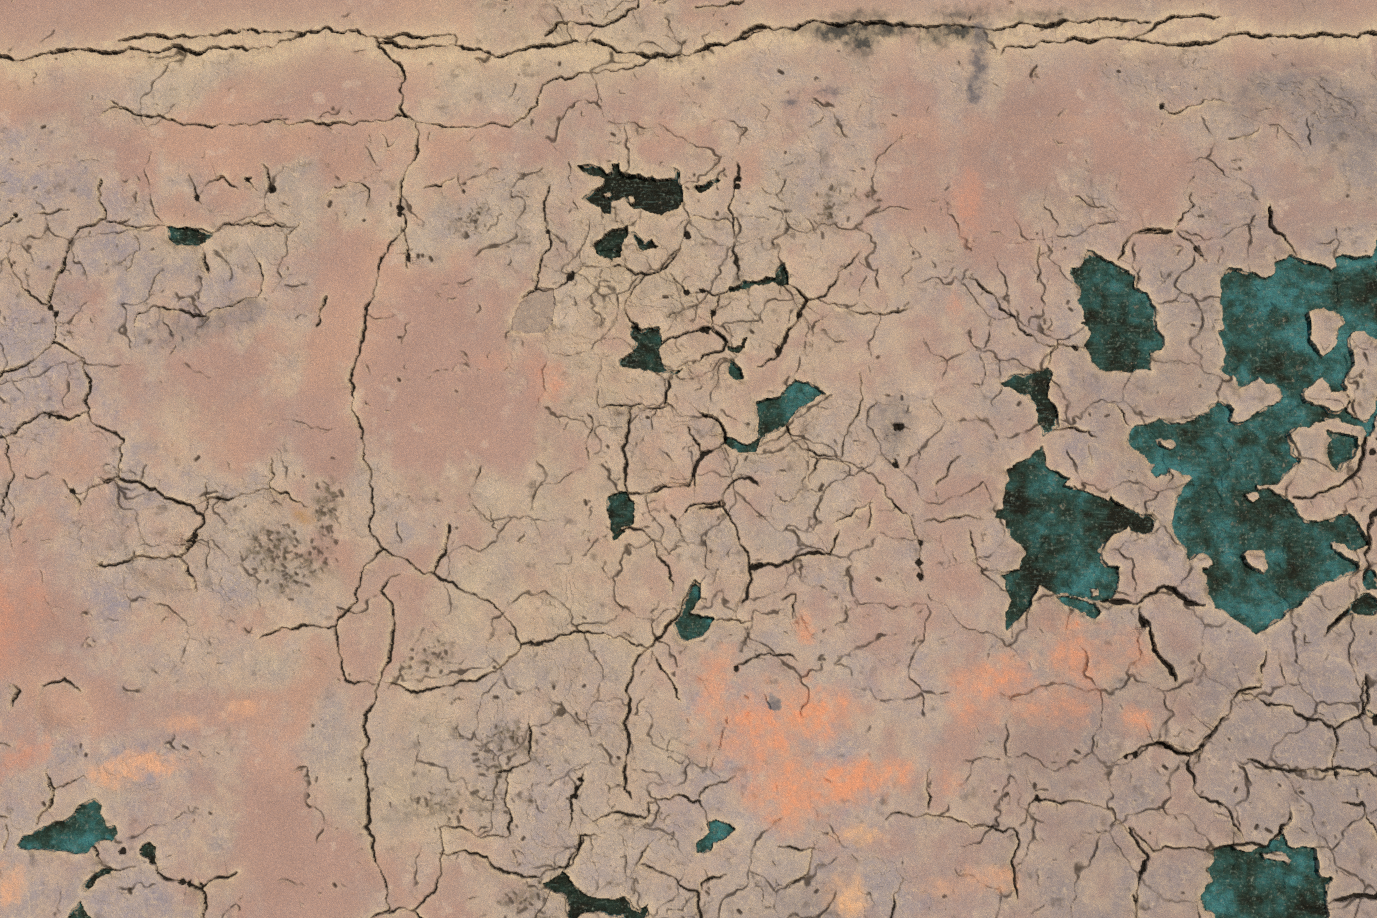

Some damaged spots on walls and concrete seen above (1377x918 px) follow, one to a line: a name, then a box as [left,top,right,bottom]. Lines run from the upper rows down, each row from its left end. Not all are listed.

crack [993,14,1377,52]
peeling [568,158,723,265]
crack [0,0,984,918]
peeling [716,337,833,463]
peeling [992,241,1377,634]
crack [1293,434,1377,500]
crack [1324,509,1377,636]
crack [1100,585,1204,681]
crack [885,651,1377,918]
peeling [17,798,118,918]
peeling [540,859,657,918]
peeling [1191,834,1333,918]